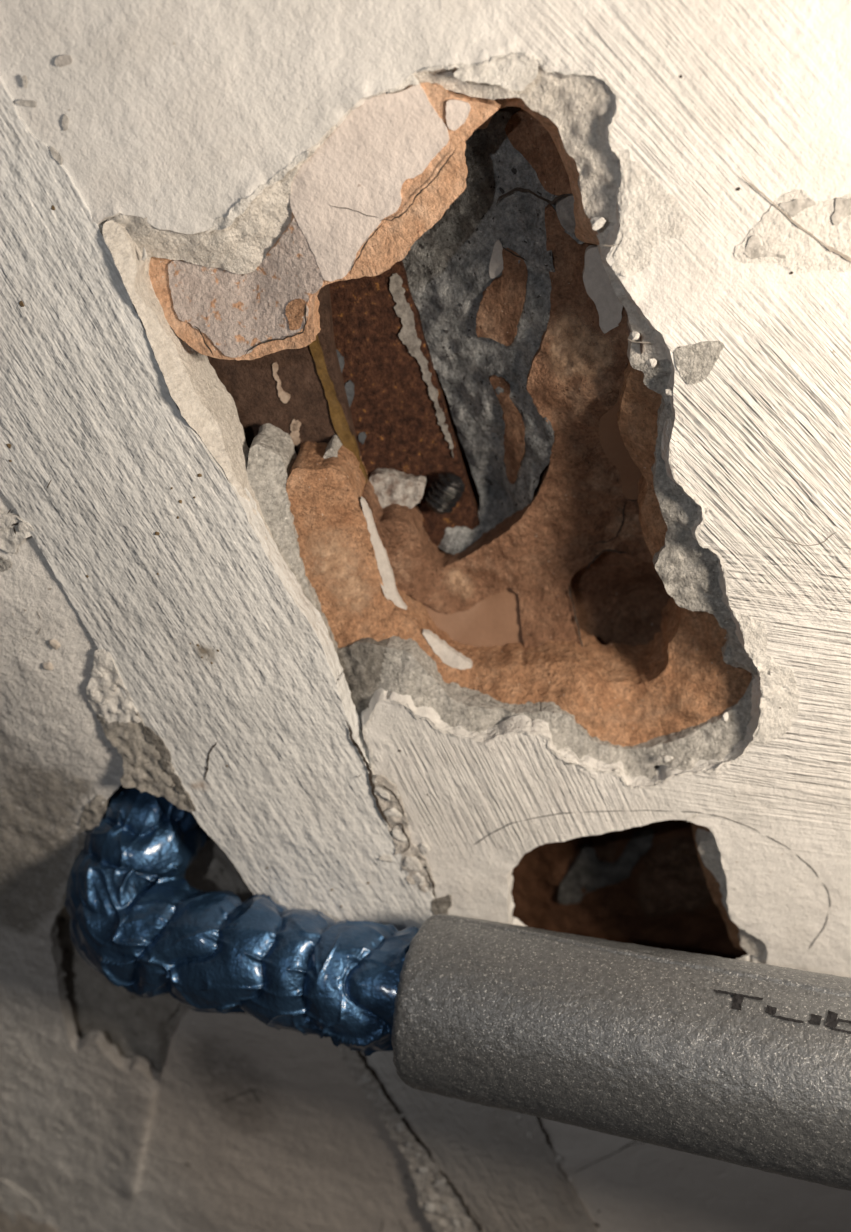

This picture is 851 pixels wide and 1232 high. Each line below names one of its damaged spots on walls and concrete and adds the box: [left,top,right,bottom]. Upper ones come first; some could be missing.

flaking render [109,50,800,789]
flaking render [74,795,108,861]
flaking render [86,648,196,812]
flaking render [184,838,254,902]
crack [345,720,436,899]
peeling [691,822,766,958]
flaking render [56,889,184,1072]
crack [332,1042,483,1232]